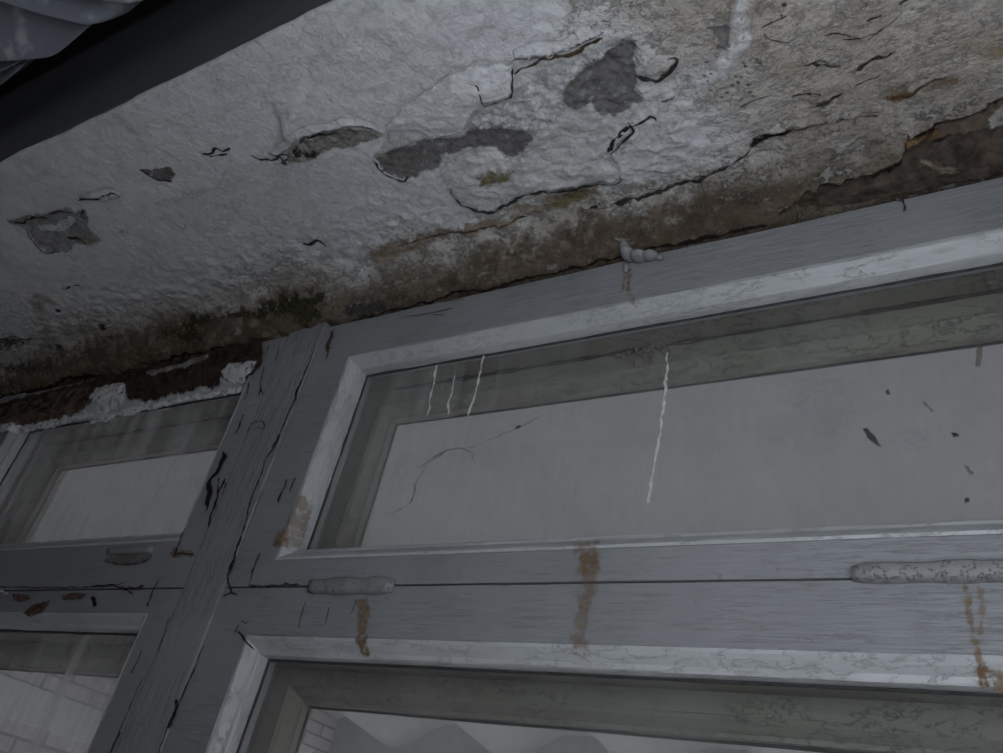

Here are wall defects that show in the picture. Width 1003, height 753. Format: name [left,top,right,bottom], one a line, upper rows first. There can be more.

damp [694,0,752,91]
peeling [7,208,99,254]
peeling [139,167,176,182]
damp [158,155,444,242]
peeling [268,25,681,215]
damp [613,80,690,187]
crack [580,0,948,212]
mould [165,289,326,341]
peeling [0,338,263,435]
crack [205,225,767,625]
crack [234,620,254,649]
rust [974,641,1003,691]